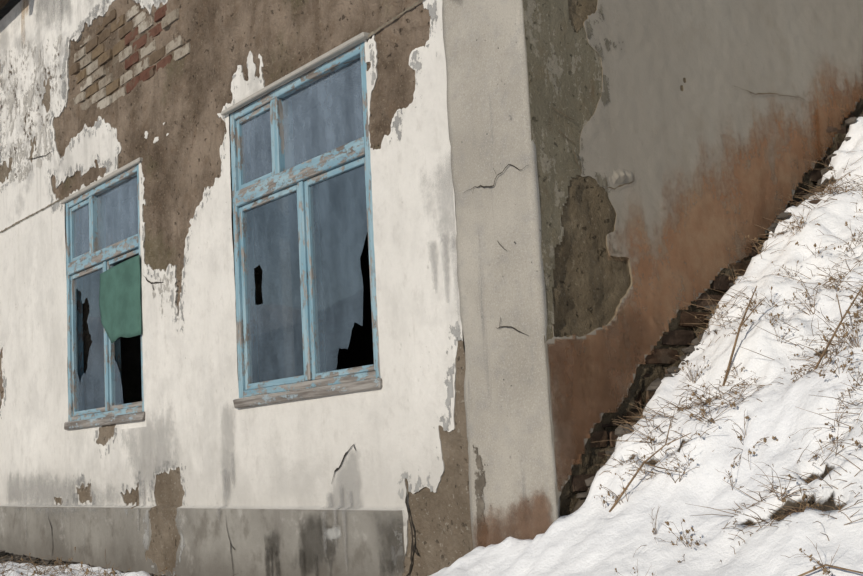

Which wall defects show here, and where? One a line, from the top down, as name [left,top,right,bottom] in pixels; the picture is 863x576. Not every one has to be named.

flaking render [568,0,603,35]
flaking render [0,0,438,332]
crack [469,164,528,190]
flaking render [121,459,188,576]
crack [331,444,356,484]
flaking render [391,321,473,576]